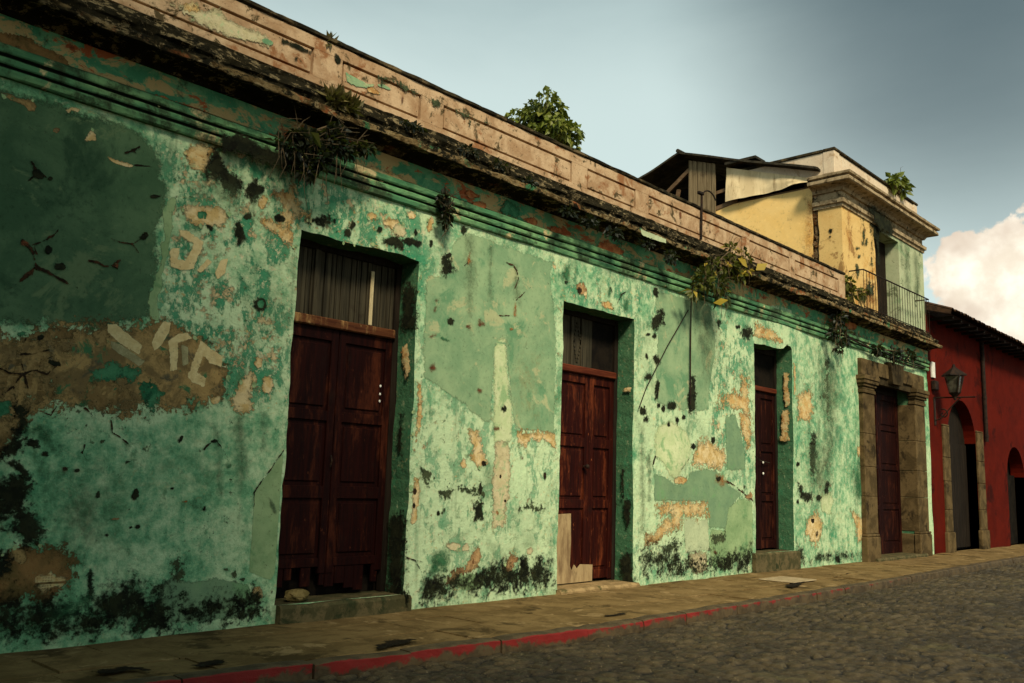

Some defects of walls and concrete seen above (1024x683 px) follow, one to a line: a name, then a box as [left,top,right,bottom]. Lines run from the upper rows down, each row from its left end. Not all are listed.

peeling [169,0,273,48]
peeling [183,142,217,174]
peeling [253,181,312,252]
leakage [399,277,419,334]
peeling [0,313,275,462]
peeling [779,363,815,442]
peeling [691,435,726,472]
leakage [0,401,264,645]
leakage [384,509,553,608]
leakage [621,455,650,528]
peeling [644,497,711,549]
leakage [616,530,754,583]